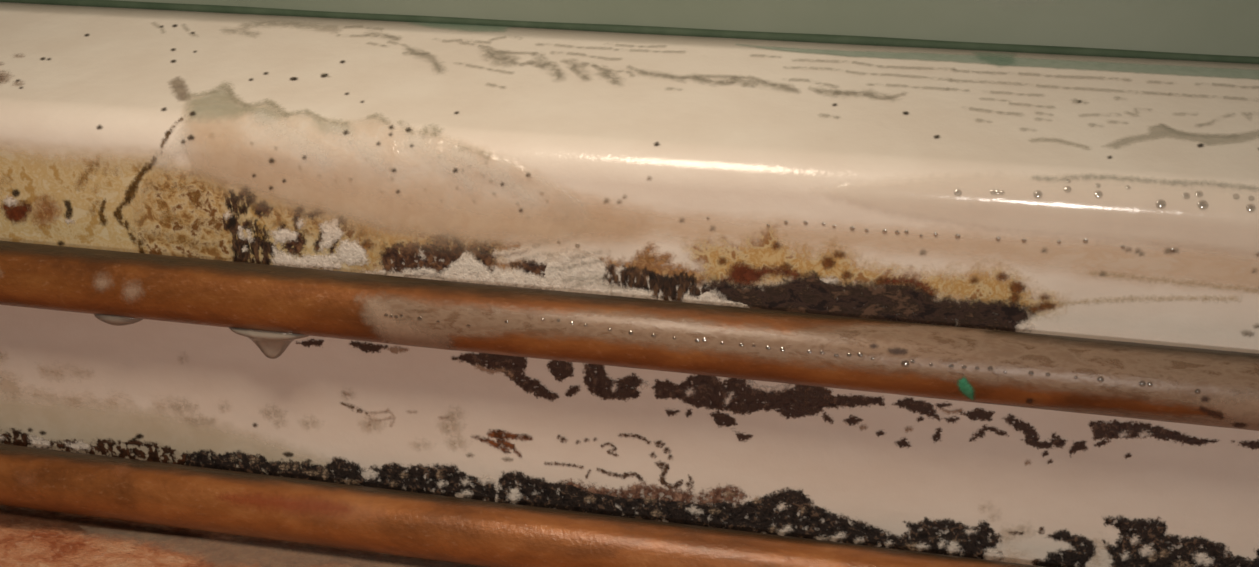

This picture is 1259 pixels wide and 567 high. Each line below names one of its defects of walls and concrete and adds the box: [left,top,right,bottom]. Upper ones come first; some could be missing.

crack [99,118,183,254]
water stain [0,151,553,290]
peeling [452,352,1259,465]